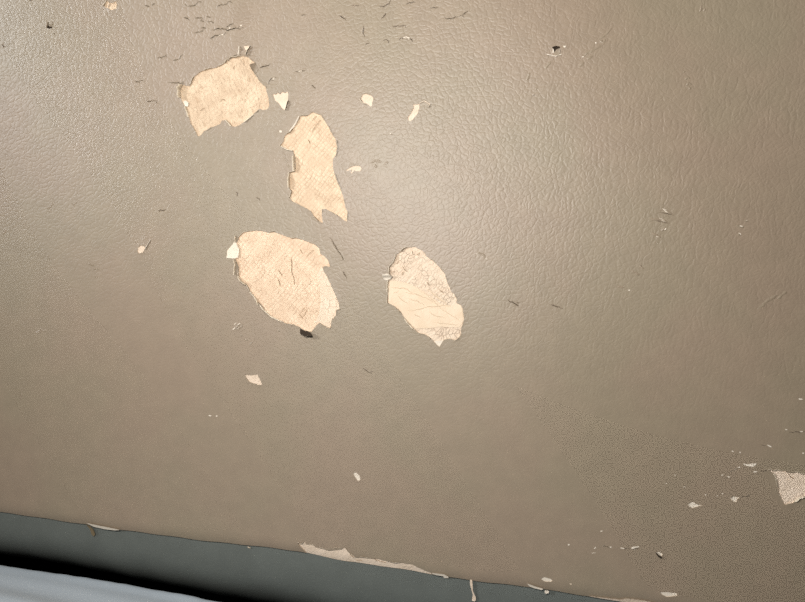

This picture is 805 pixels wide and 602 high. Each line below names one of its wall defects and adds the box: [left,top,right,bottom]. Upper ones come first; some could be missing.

peeling [176,45,288,136]
peeling [360,94,373,106]
peeling [408,100,430,121]
peeling [279,112,348,223]
peeling [227,230,340,336]
peeling [382,247,464,347]
peeling [245,375,262,385]
peeling [721,463,805,505]
peeling [297,541,431,574]